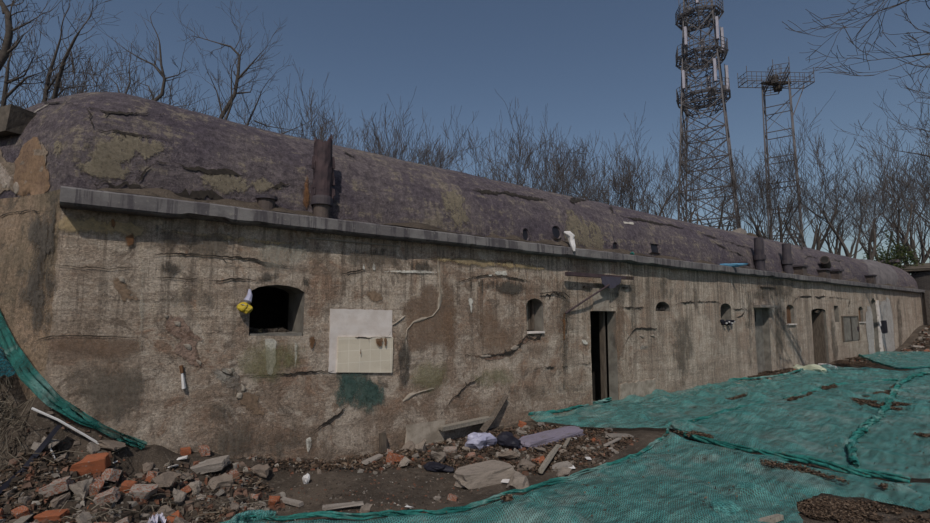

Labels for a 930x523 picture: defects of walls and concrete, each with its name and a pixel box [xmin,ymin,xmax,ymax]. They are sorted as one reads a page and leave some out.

crack [35,101,173,141]
peeling [0,137,62,196]
crack [94,160,303,200]
crack [52,253,301,284]
crack [222,369,334,377]
damp [335,372,384,411]
crack [440,334,542,415]
crack [316,407,346,430]